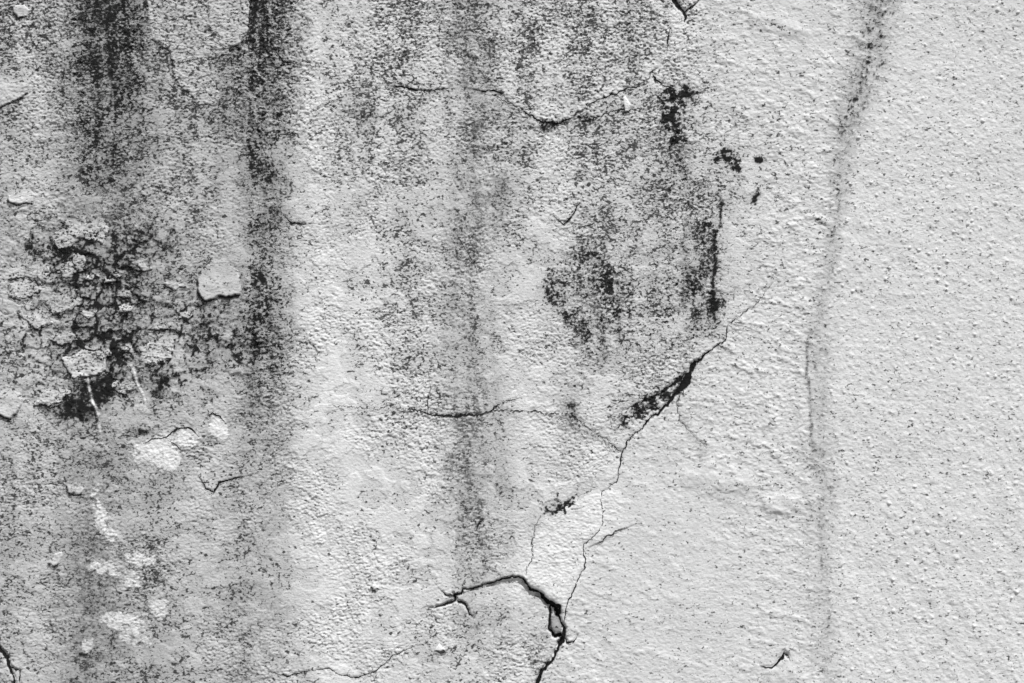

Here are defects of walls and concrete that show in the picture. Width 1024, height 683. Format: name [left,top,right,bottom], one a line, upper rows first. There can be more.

spalling [0,215,193,420]
leakage [7,0,308,477]
crack [395,84,449,92]
leakage [433,0,516,590]
crack [328,285,771,683]
crack [474,68,675,125]
leakage [522,85,762,446]